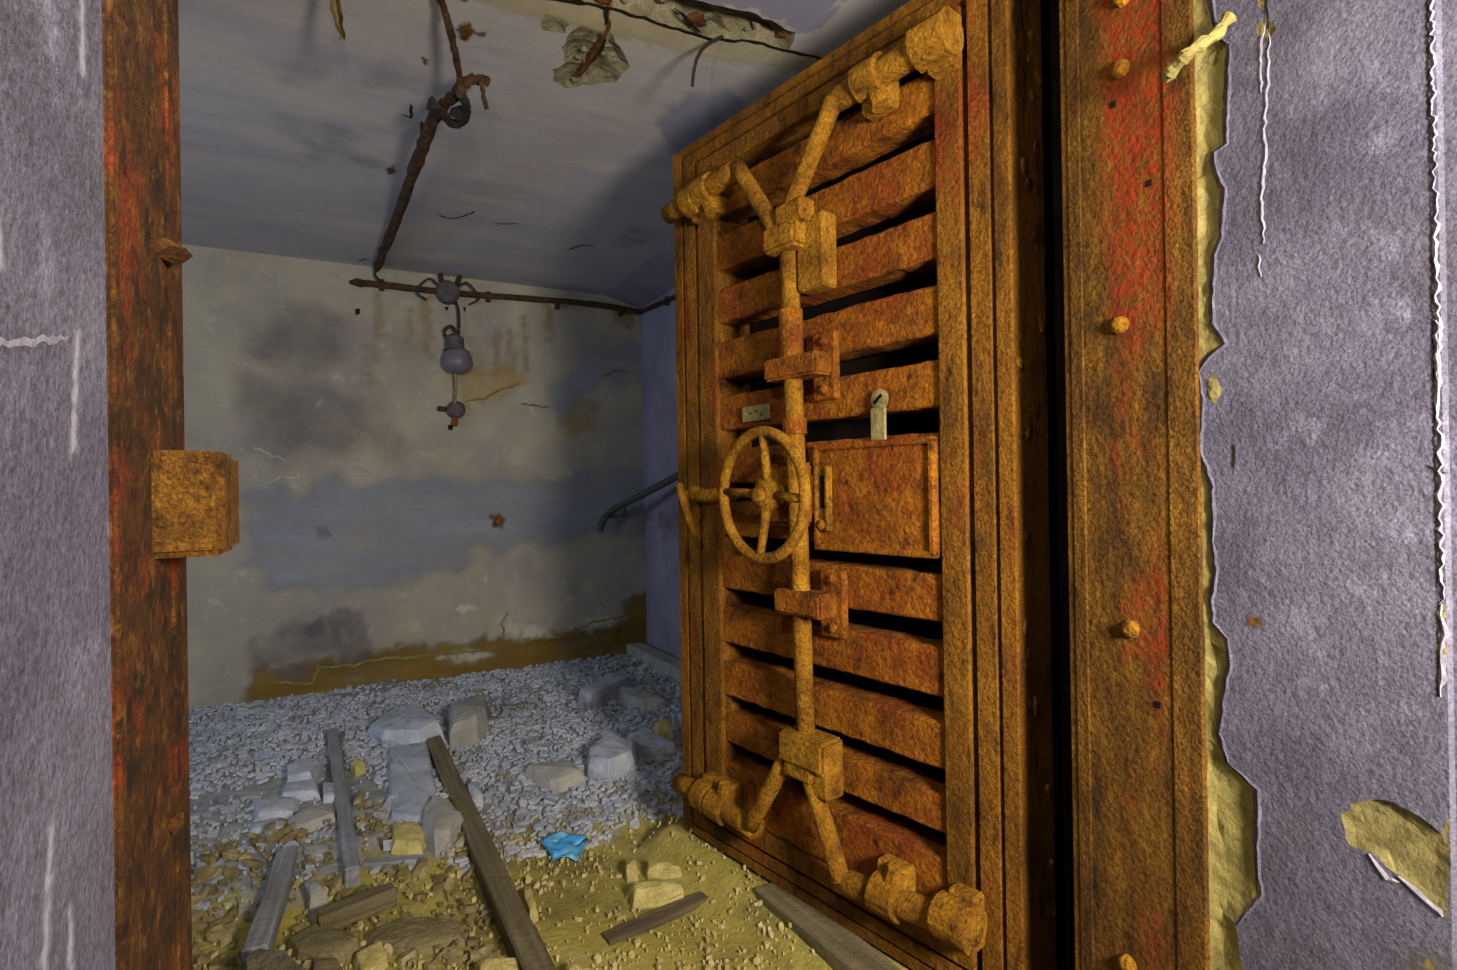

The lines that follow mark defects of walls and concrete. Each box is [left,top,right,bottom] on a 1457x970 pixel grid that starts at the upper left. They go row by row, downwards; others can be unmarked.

spalling [540,4,629,88]
crack [1256,0,1276,277]
spalling [1193,0,1264,970]
leakage [247,591,647,702]
peeling [1341,799,1452,917]